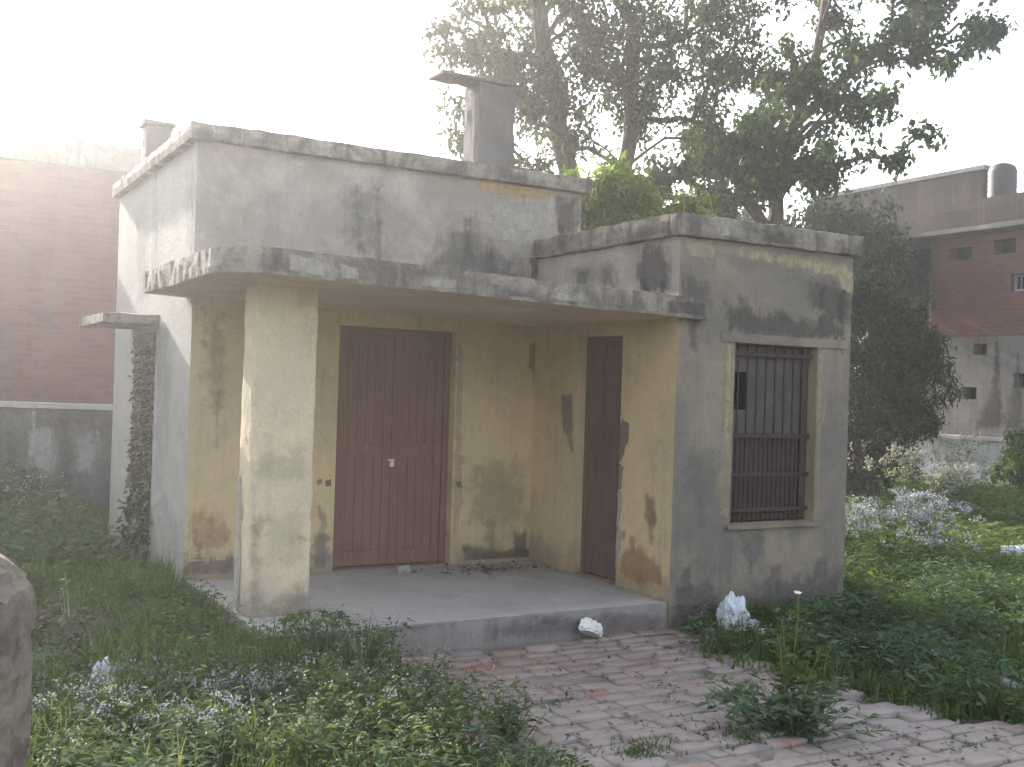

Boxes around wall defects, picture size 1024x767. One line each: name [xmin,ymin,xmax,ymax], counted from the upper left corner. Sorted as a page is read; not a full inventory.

water stain [556,196,579,234]
water stain [340,263,359,279]
water stain [637,227,704,315]
water stain [729,311,844,338]
spalling [561,395,572,433]
spalling [615,418,629,569]